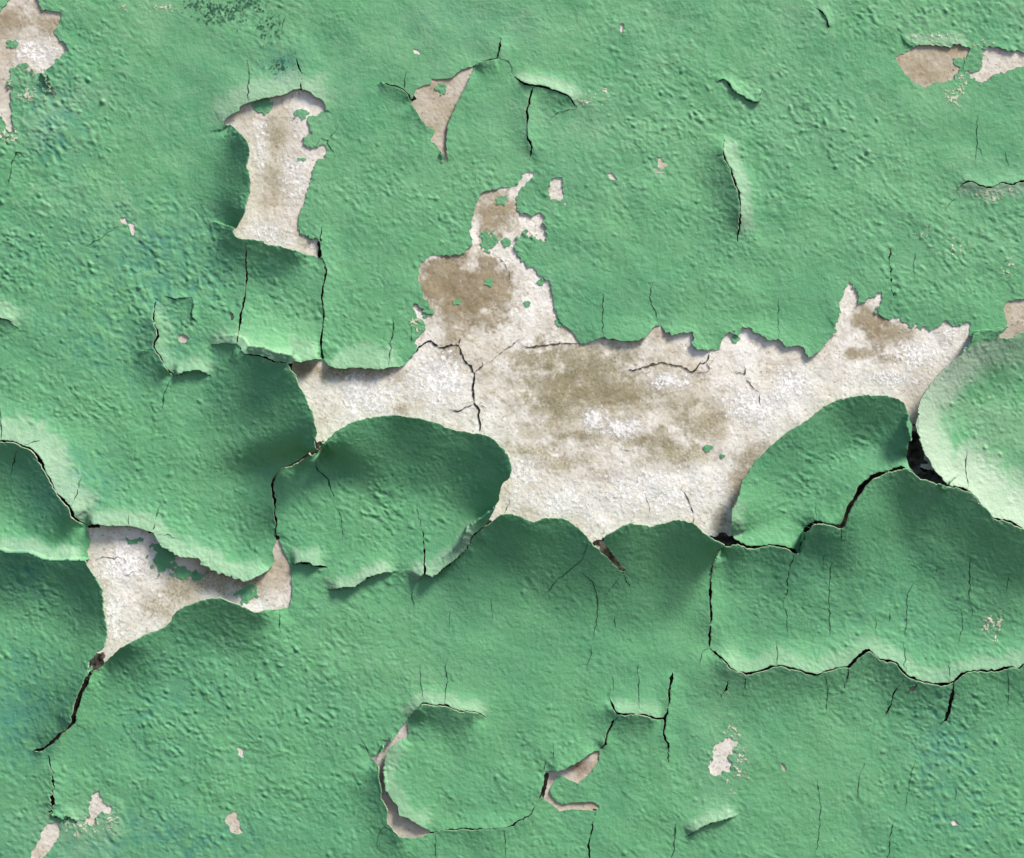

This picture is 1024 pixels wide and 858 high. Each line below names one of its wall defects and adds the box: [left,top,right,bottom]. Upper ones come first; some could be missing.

peeling [184,59,339,258]
peeling [410,67,474,163]
crack [473,41,577,159]
peeling [896,44,1024,88]
crack [388,293,604,430]
peeling [0,172,1024,753]
leakage [504,345,742,525]
leakage [685,362,820,436]
crack [699,456,1024,722]
crack [34,671,92,823]
peeling [352,704,609,838]
crack [600,664,673,762]